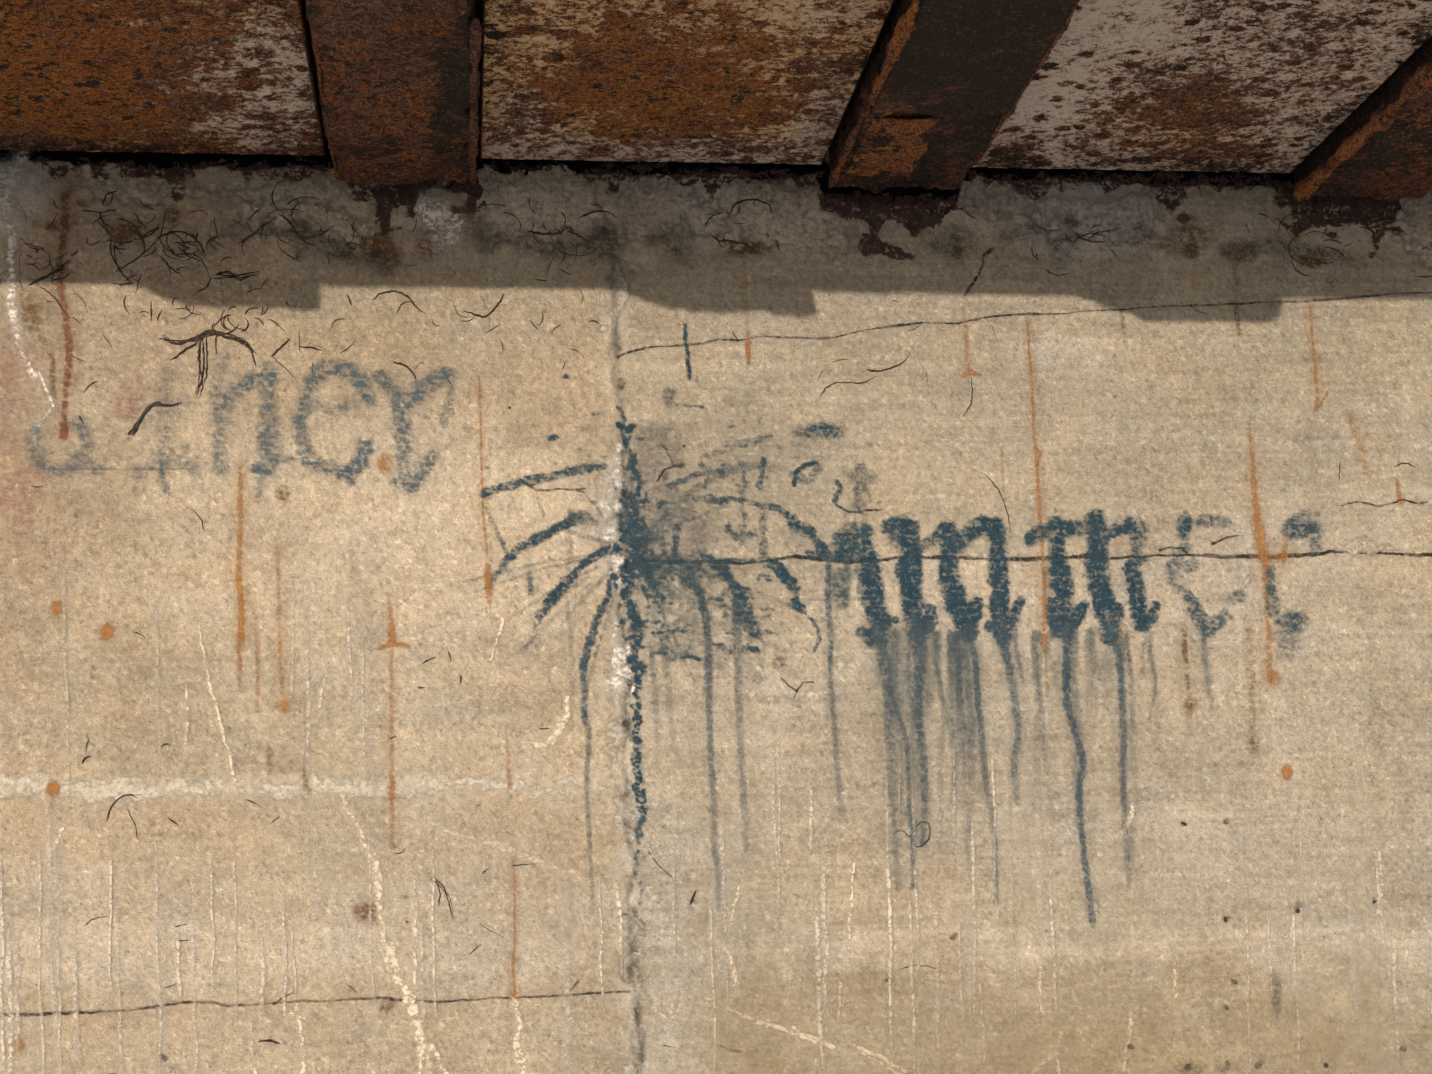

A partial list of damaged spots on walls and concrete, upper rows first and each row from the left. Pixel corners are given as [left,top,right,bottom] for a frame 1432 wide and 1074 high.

leakage [0,151,54,427]
rust [0,150,334,439]
leakage [414,194,468,250]
leakage [481,227,625,281]
rust [347,160,959,271]
crack [617,206,1431,357]
rust [966,169,1407,262]
rust [235,467,245,679]
crack [627,509,1432,568]
crack [1339,499,1428,507]
leakage [291,593,328,767]
crack [0,982,627,1016]